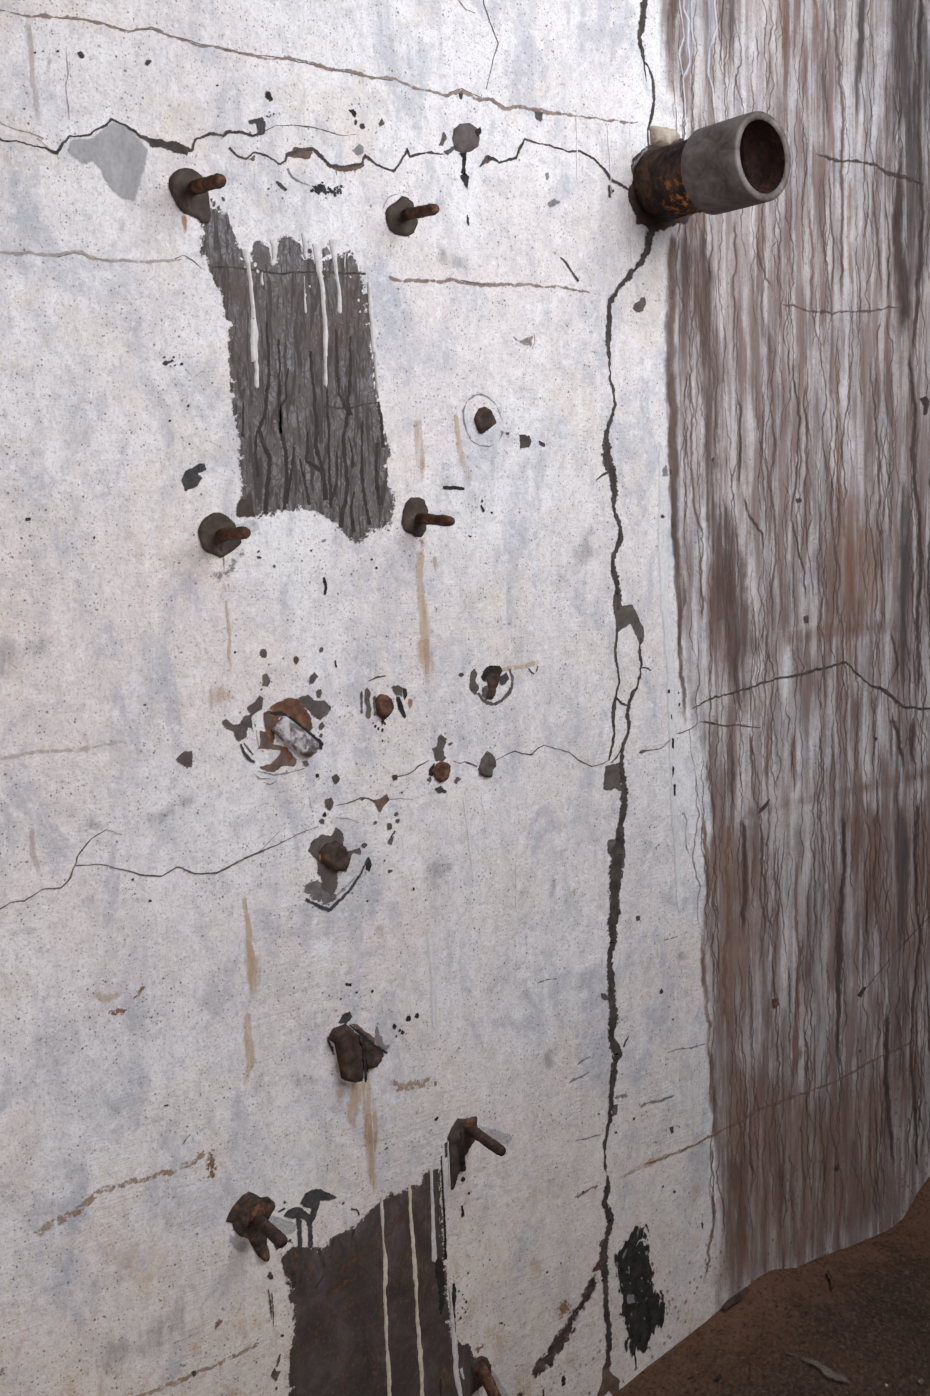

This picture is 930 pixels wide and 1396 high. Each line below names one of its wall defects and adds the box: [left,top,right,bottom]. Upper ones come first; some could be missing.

crack [0,18,444,174]
crack [450,0,511,107]
crack [480,138,631,192]
crack [637,0,656,147]
peeling [200,197,395,551]
leakage [659,0,930,1295]
crack [0,760,429,909]
crack [455,225,930,1396]
peeling [267,1131,490,1396]